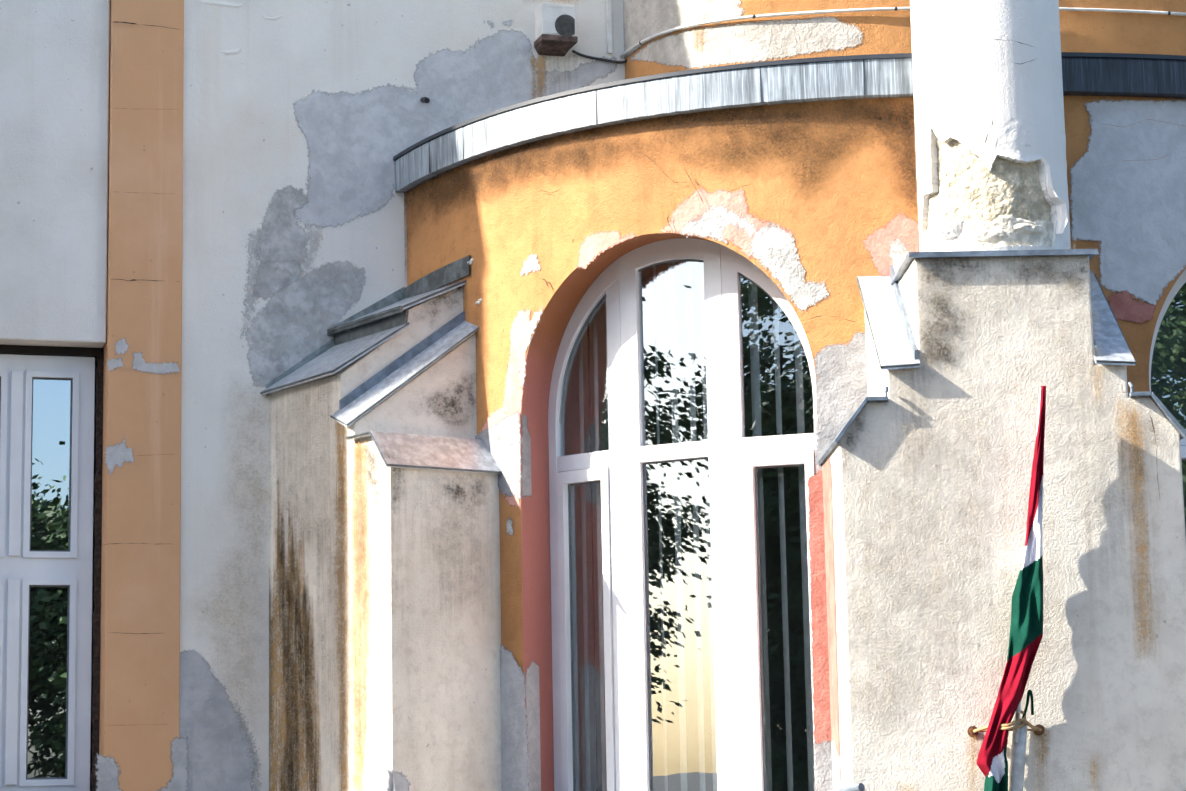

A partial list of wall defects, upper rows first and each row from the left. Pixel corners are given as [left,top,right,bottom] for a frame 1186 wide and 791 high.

peeling [661,186,795,257]
spalling [862,128,1068,276]
peeling [1108,290,1156,323]
peeling [107,337,180,375]
peeling [480,309,542,432]
peeling [105,434,134,474]
peeling [504,495,520,535]
leakage [269,493,319,791]
peeling [95,753,123,791]
peeling [157,736,189,791]